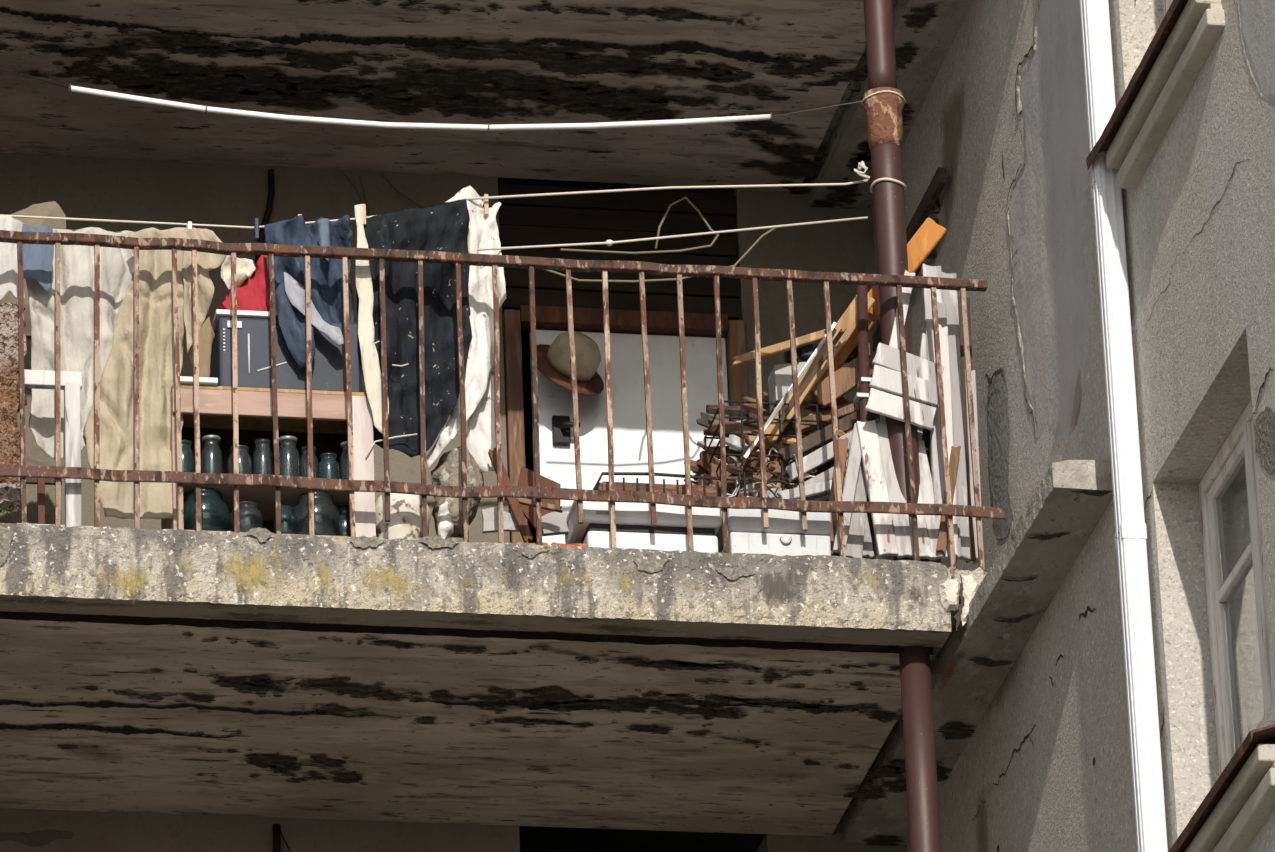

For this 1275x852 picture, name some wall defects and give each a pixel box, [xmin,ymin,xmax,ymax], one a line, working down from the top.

crack [1002,11,1037,435]
crack [1143,159,1248,335]
peeling [985,368,1012,539]
leakage [761,571,793,600]
spalling [939,574,979,631]
crack [969,725,1037,821]